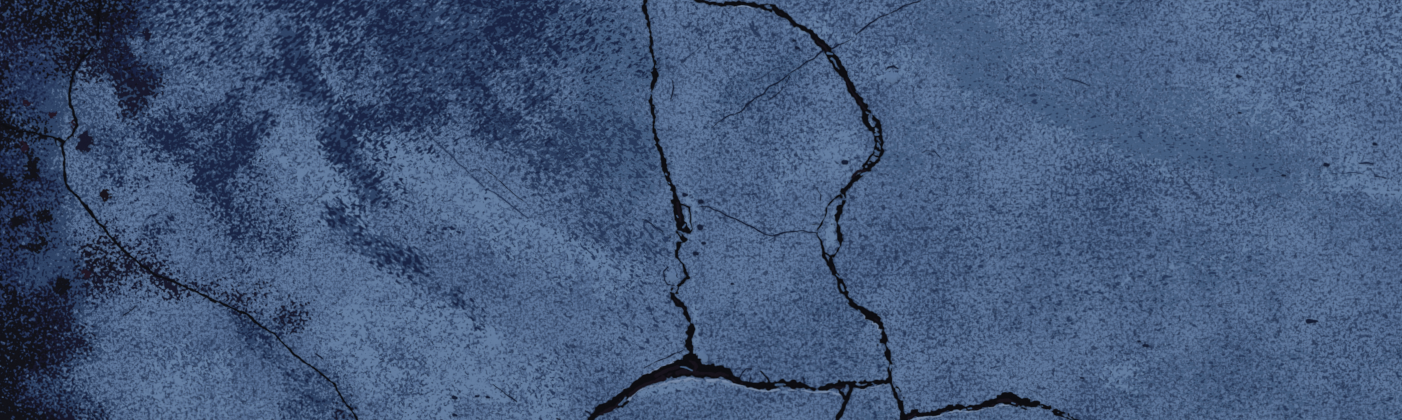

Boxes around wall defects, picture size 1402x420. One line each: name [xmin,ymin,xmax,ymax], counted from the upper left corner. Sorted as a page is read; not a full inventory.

crack [0,0,358,420]
crack [426,133,529,219]
crack [556,0,1079,420]